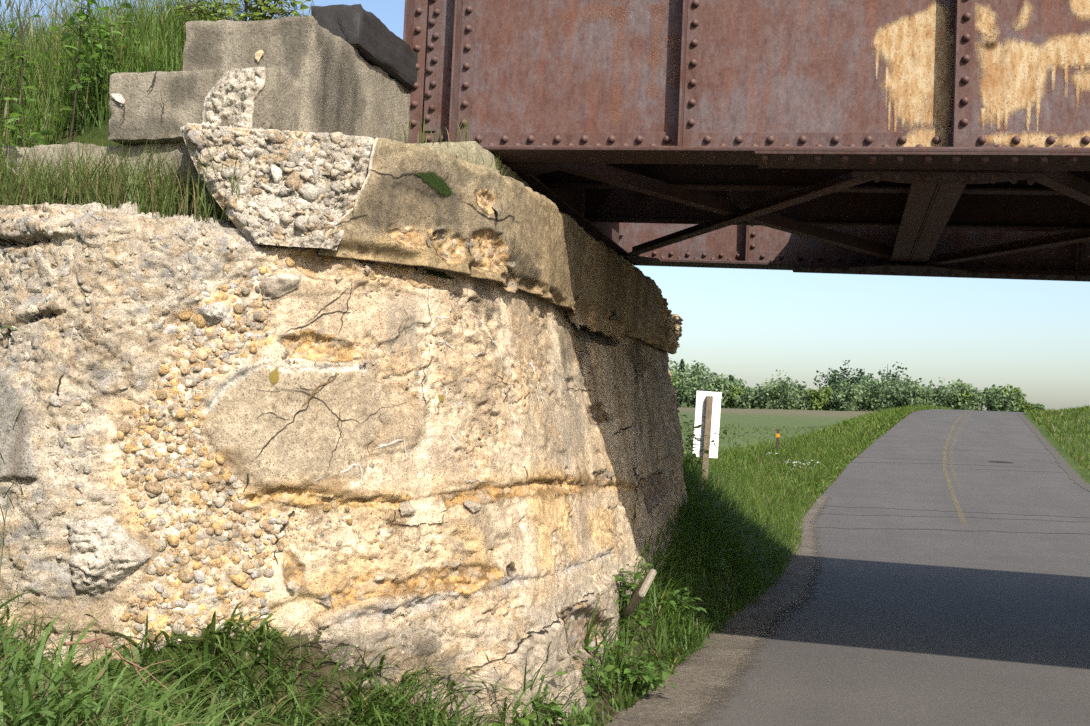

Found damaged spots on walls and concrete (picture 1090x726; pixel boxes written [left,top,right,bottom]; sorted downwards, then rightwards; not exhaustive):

rust [1070,0,1090,19]
rust [873,3,953,147]
rust [975,4,1090,147]
spalling [180,50,444,299]
spalling [389,188,519,292]
crack [243,367,427,493]
crack [466,592,594,670]